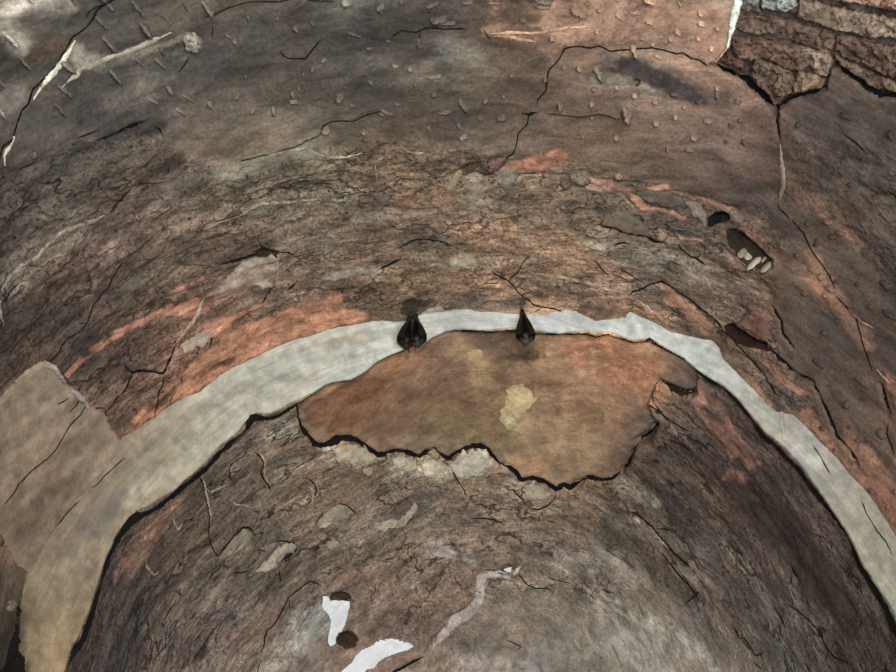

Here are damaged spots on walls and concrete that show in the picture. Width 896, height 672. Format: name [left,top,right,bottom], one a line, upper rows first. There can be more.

crack [0,0,114,169]
crack [78,122,163,139]
flaking render [482,0,896,105]
crack [506,45,896,158]
crack [778,206,895,455]
flaking render [322,546,521,672]